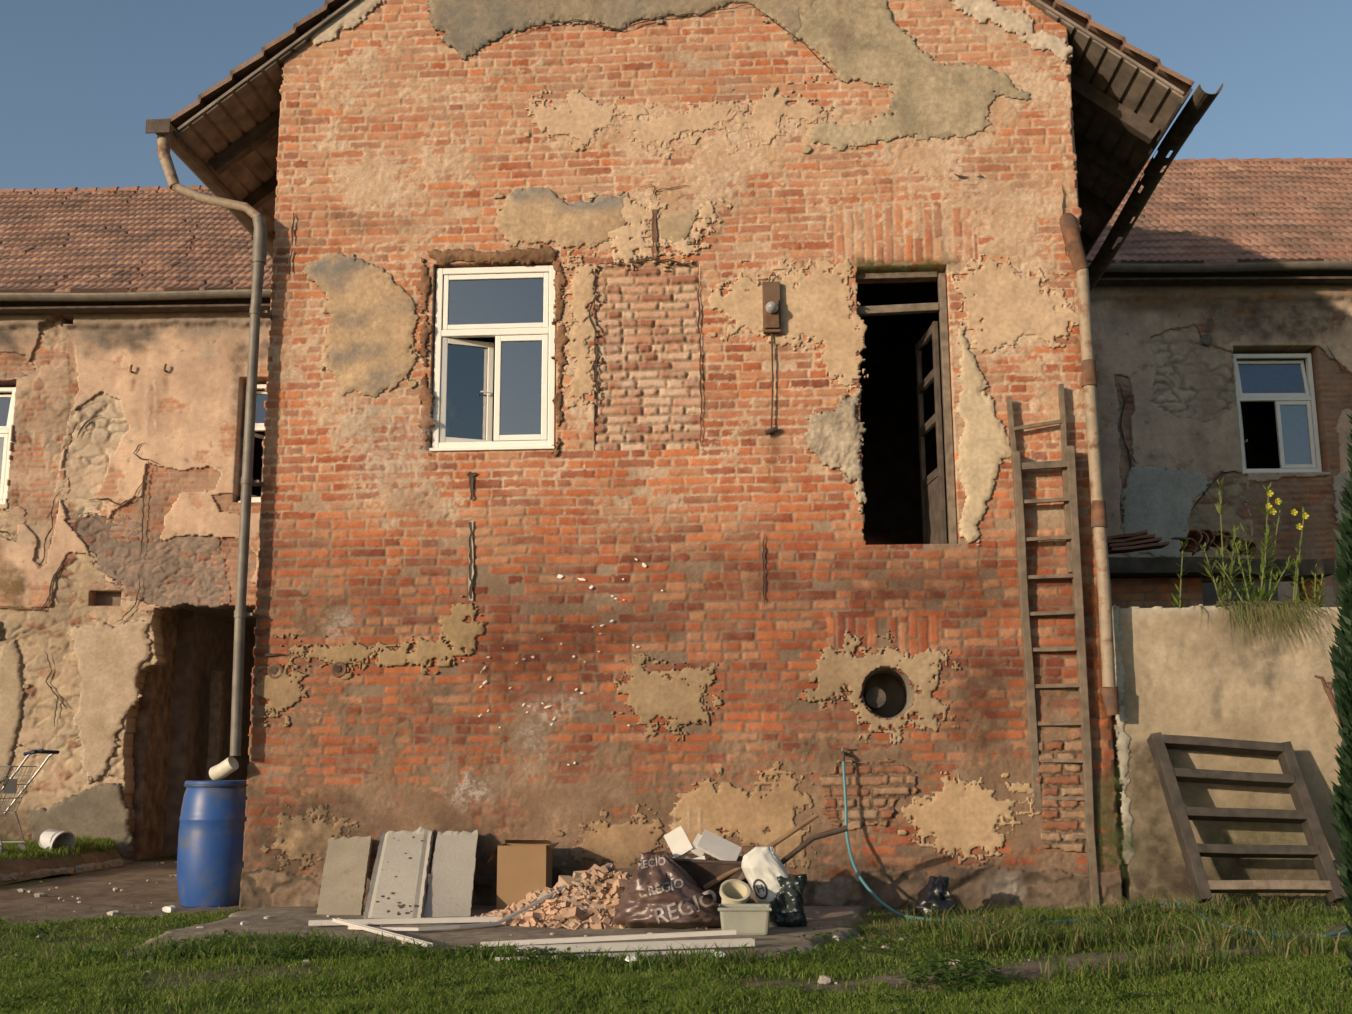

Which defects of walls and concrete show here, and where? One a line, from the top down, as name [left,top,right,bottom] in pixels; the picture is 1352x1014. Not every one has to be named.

flaking render [426,0,1031,159]
flaking render [1150,325,1237,423]
crack [0,442,158,623]
flaking render [0,315,260,859]
spalling [467,471,477,500]
flaking render [1114,375,1134,523]
flaking render [1188,346,1352,564]
crack [45,652,80,740]
hole [861,666,915,720]
flaking render [260,804,358,870]
flaking render [551,737,1087,869]